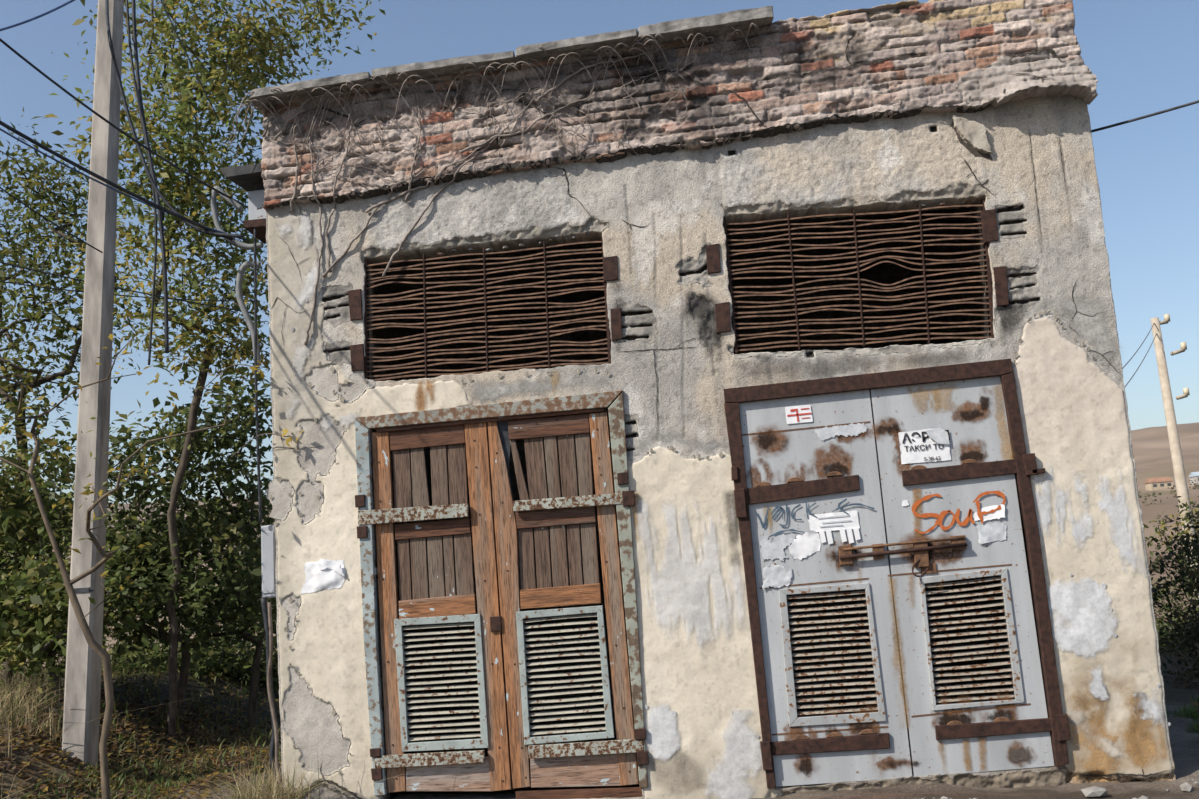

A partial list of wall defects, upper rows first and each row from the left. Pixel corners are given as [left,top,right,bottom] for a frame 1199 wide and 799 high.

crack [257,30,996,346]
flaking render [266,266,375,527]
rust [746,418,910,487]
rust [832,544,861,568]
peeling [1048,573,1116,700]
flaking render [282,593,354,799]
crack [278,761,363,799]
peeling [645,704,679,759]
peeling [706,710,762,799]
rust [794,753,812,776]
rust [784,709,880,741]
water stain [1069,690,1166,782]